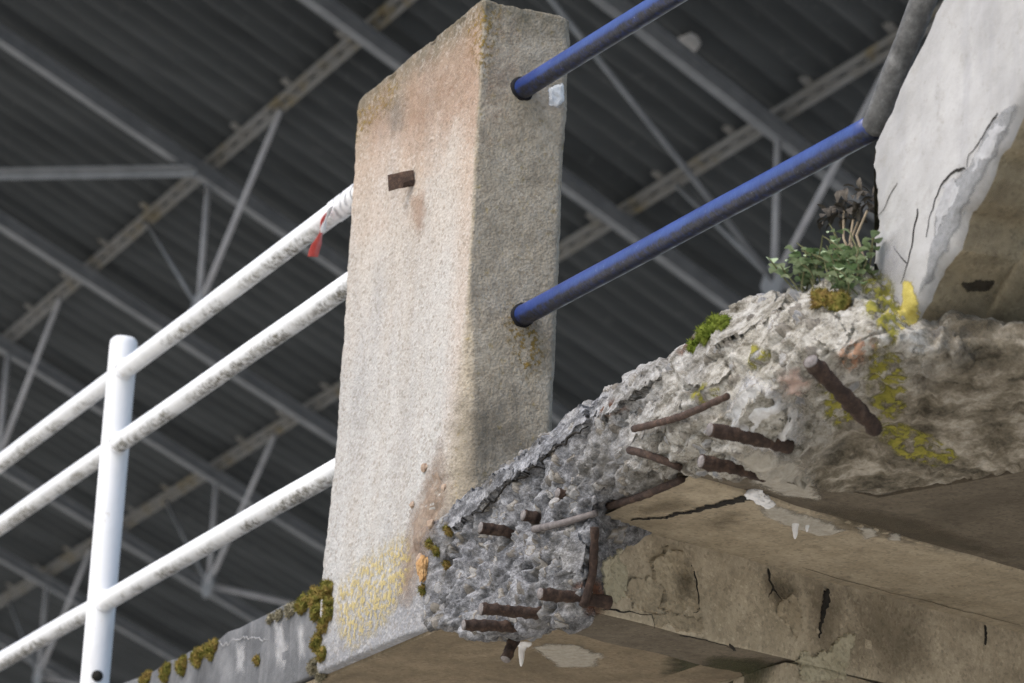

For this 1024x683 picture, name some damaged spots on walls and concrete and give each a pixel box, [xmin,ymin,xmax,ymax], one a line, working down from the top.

crack [894,112,998,282]
peeling [920,106,1016,290]
crack [630,496,751,521]
spalling [401,265,1024,663]
crack [767,568,781,598]
flaking render [792,632,856,683]
damp [726,376,977,550]
crack [802,567,1018,645]